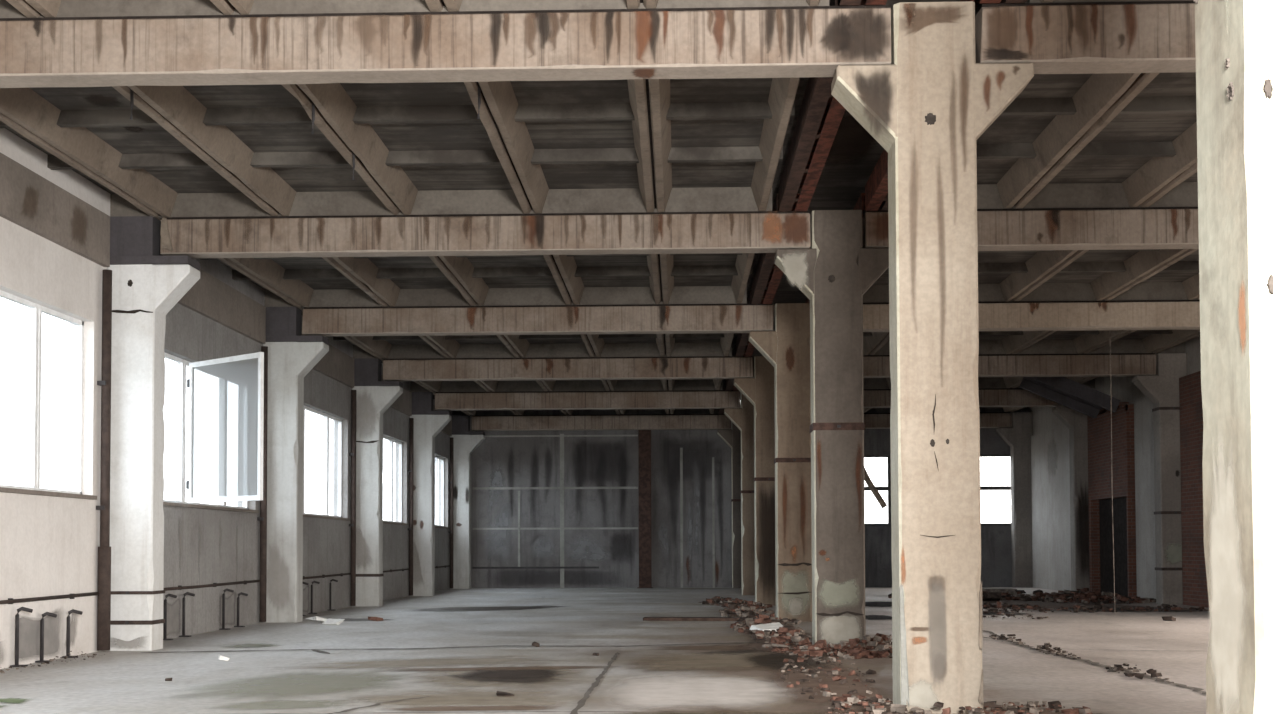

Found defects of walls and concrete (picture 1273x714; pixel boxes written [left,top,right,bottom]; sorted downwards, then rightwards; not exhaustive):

rust [634,11,668,78]
rust [708,10,735,52]
water stain [766,9,886,59]
water stain [907,8,960,32]
water stain [826,73,891,163]
rust [763,214,808,243]
rust [783,477,805,560]